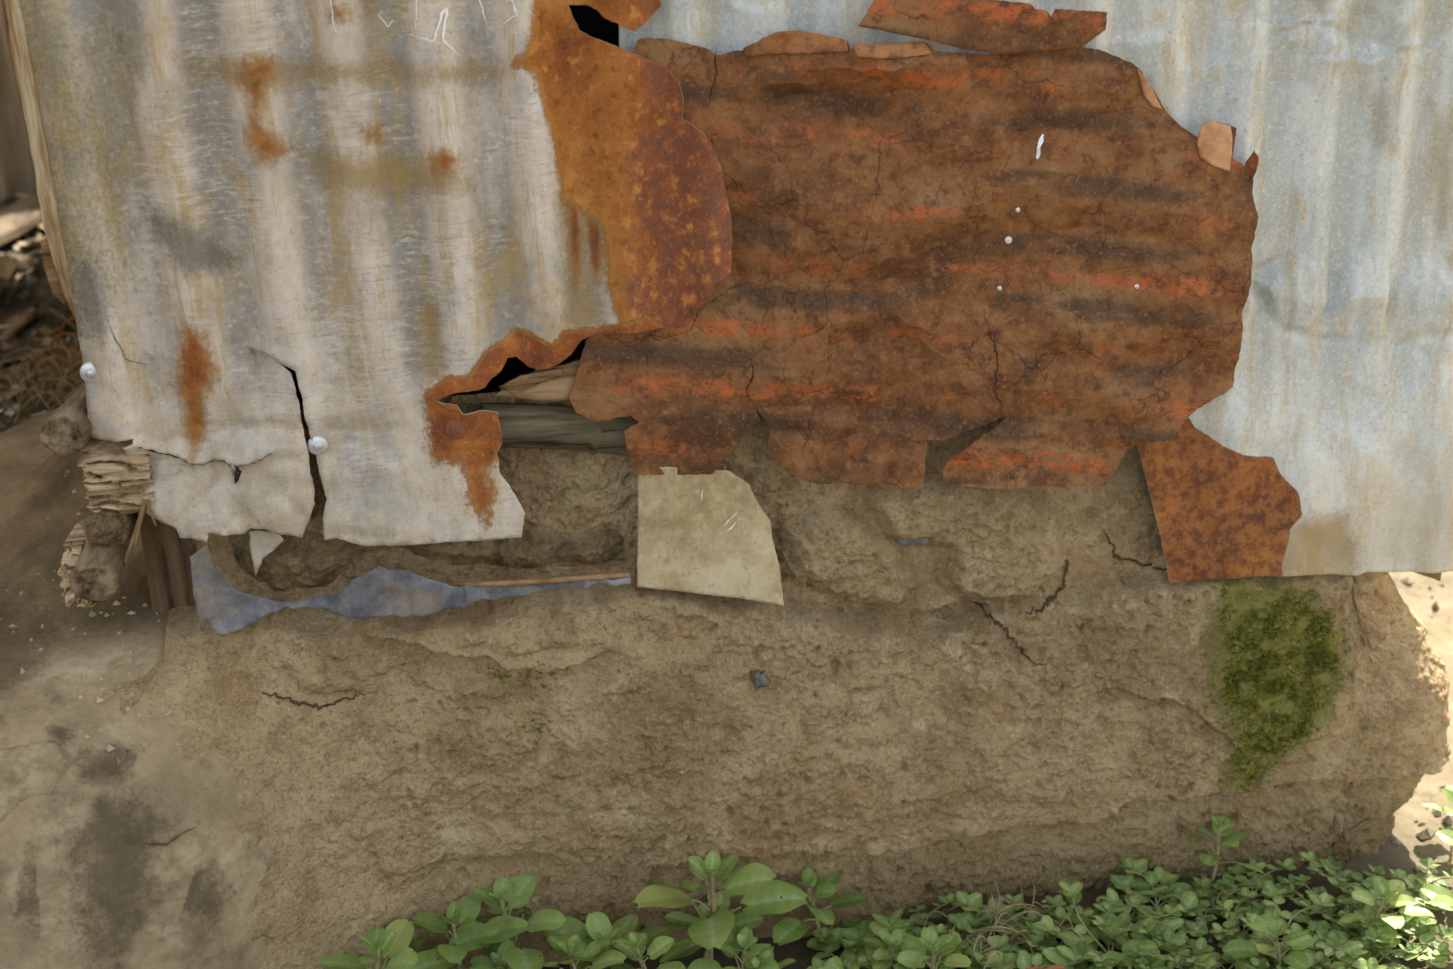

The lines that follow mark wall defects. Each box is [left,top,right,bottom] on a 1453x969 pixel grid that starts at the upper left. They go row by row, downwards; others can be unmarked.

corrosion [422,0,1302,583]
corrosion [177,327,216,460]
crack [970,559,1069,666]
crack [1104,531,1167,571]